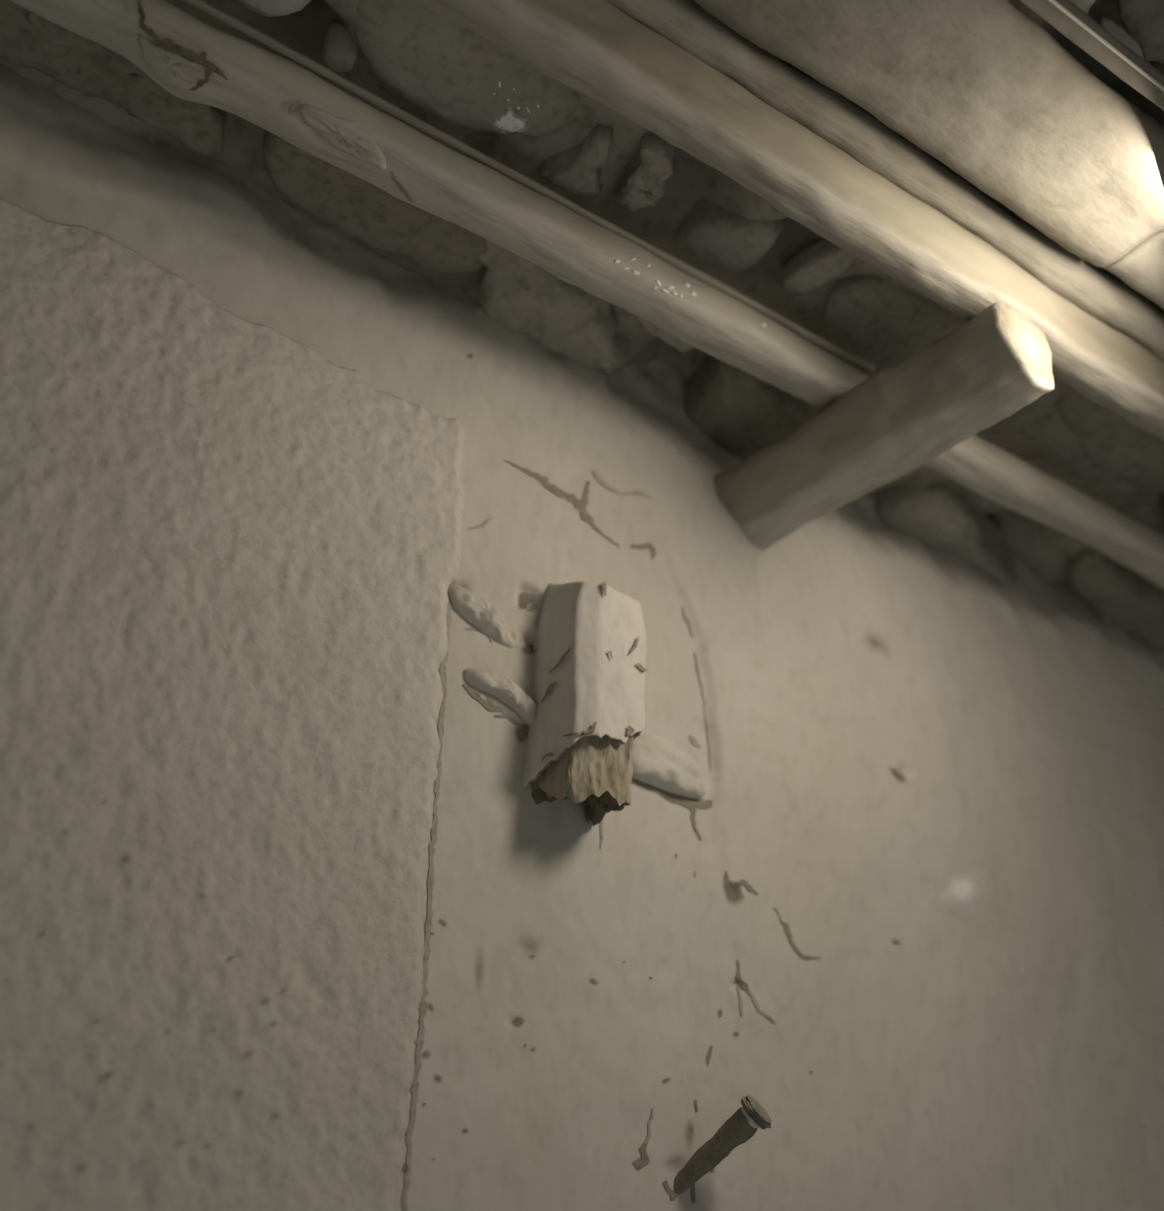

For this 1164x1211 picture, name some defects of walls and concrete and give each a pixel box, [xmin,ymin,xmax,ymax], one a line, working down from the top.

crack [137,0,228,91]
crack [505,460,656,558]
flaking render [520,593,534,608]
crack [774,907,820,959]
crack [736,959,776,1023]